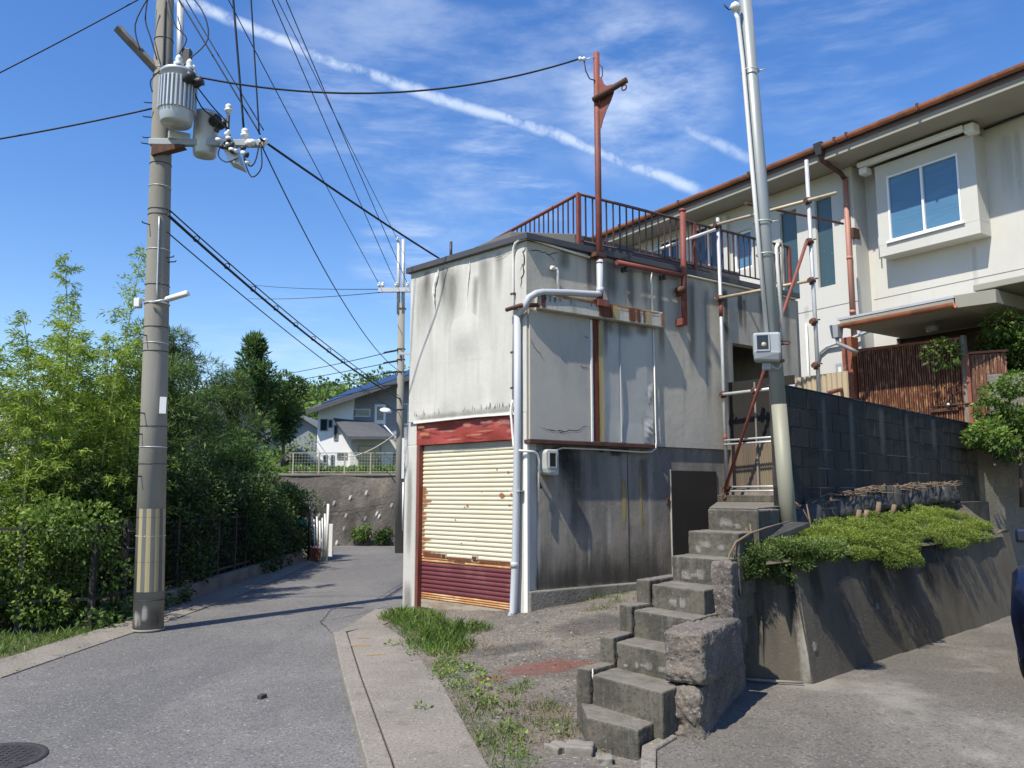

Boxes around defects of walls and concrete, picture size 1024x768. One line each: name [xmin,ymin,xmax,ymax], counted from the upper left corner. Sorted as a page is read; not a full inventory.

rust [542,295,664,442]
peeling [418,421,511,440]
leakage [553,447,571,468]